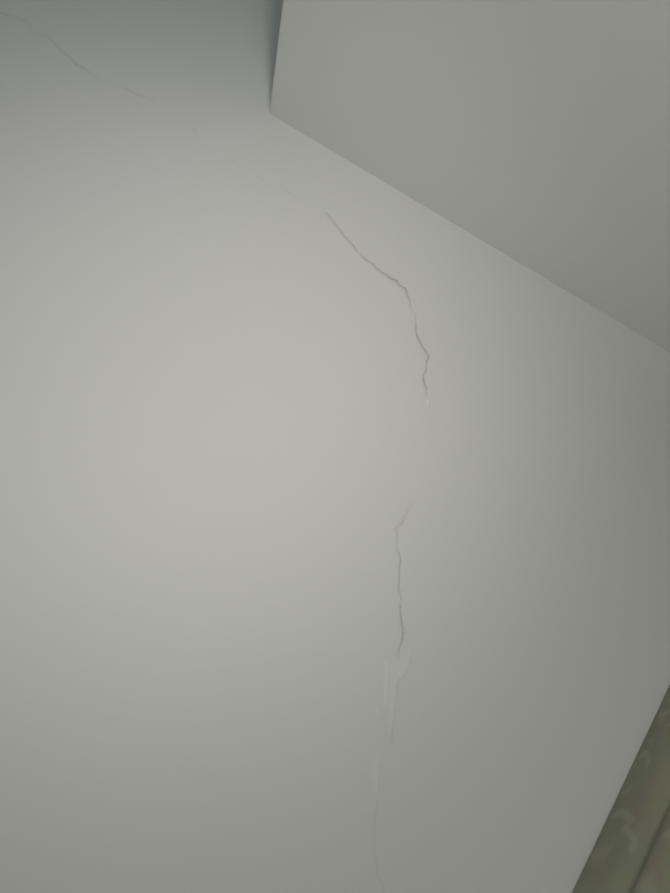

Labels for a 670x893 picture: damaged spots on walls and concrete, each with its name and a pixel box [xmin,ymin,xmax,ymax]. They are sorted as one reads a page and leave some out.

crack [325,212,430,397]
crack [393,502,413,661]